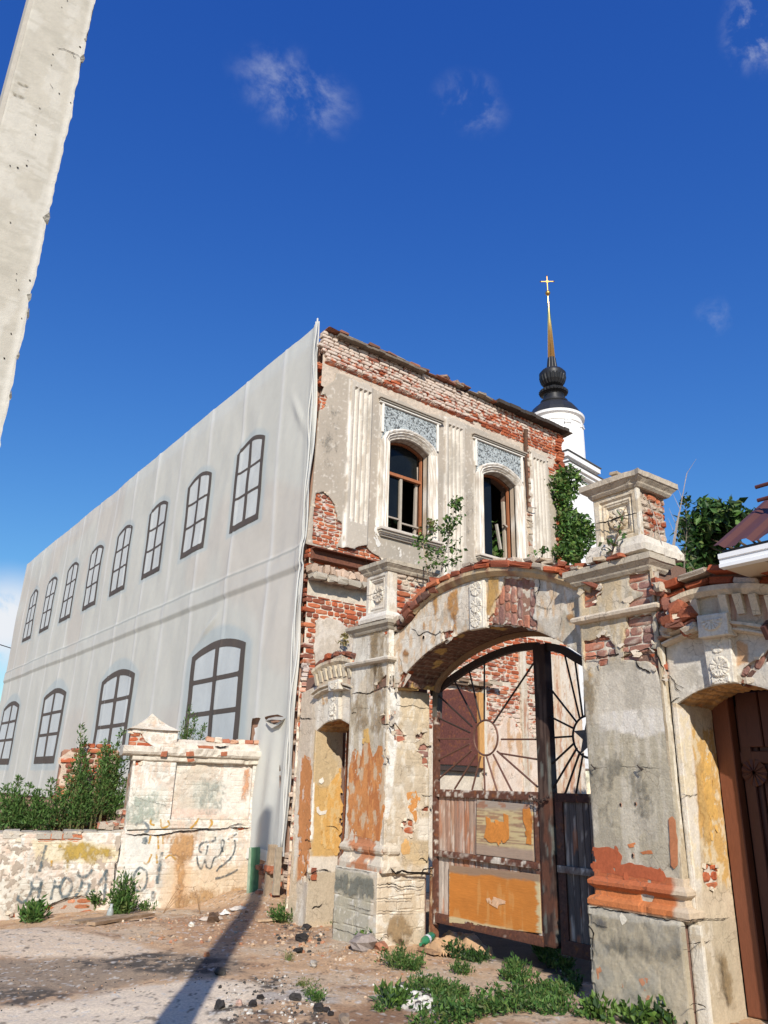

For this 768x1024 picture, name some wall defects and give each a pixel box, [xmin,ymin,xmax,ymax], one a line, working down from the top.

flaking render [308,492,383,561]
flaking render [487,576,538,632]
spalling [585,571,698,683]
peeling [255,682,433,916]
peeling [701,752,719,841]
crack [113,823,246,887]
peeling [590,816,678,882]